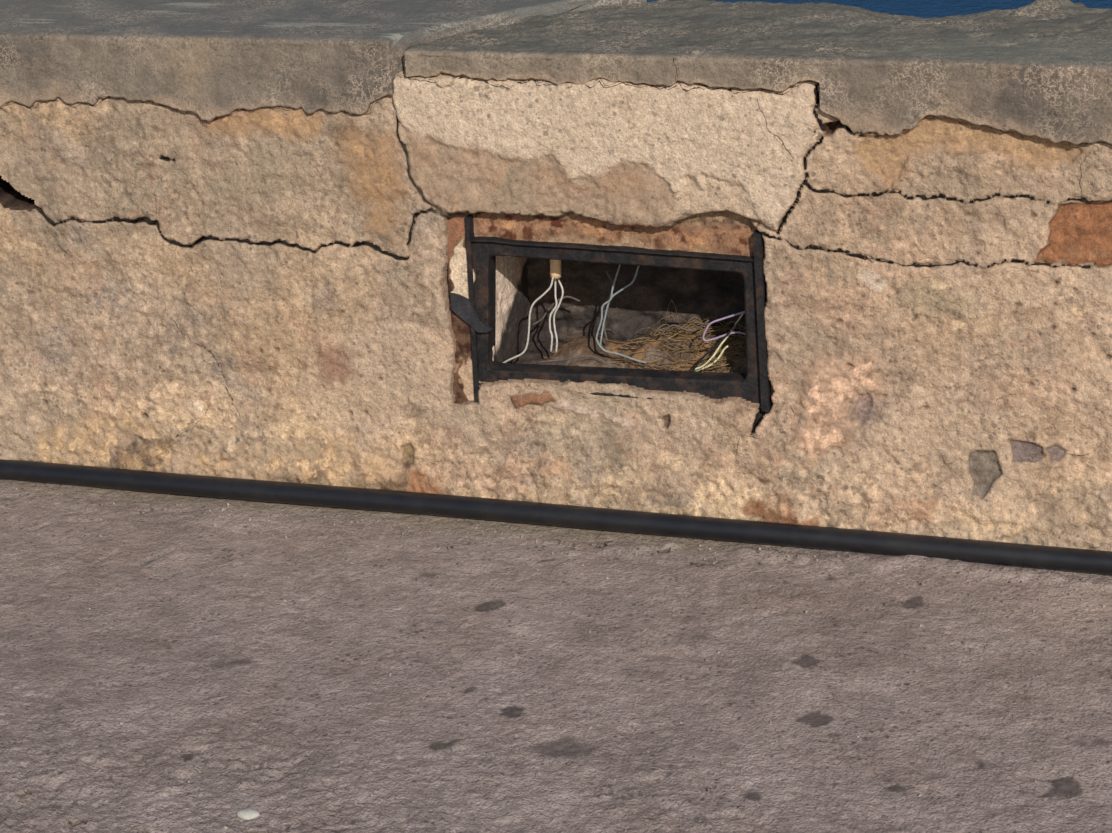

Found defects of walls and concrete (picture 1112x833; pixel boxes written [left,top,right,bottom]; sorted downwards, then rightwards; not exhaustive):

spalling [0,175,39,212]
crack [2,97,469,260]
crack [398,58,1112,268]
rust [447,212,754,257]
spalling [687,211,758,227]
spalling [1036,202,1112,267]
peeling [450,239,475,299]
peeling [458,358,481,401]
spalling [511,392,556,408]
crack [737,403,794,450]
spalling [969,450,1002,499]
spalling [1010,440,1065,462]